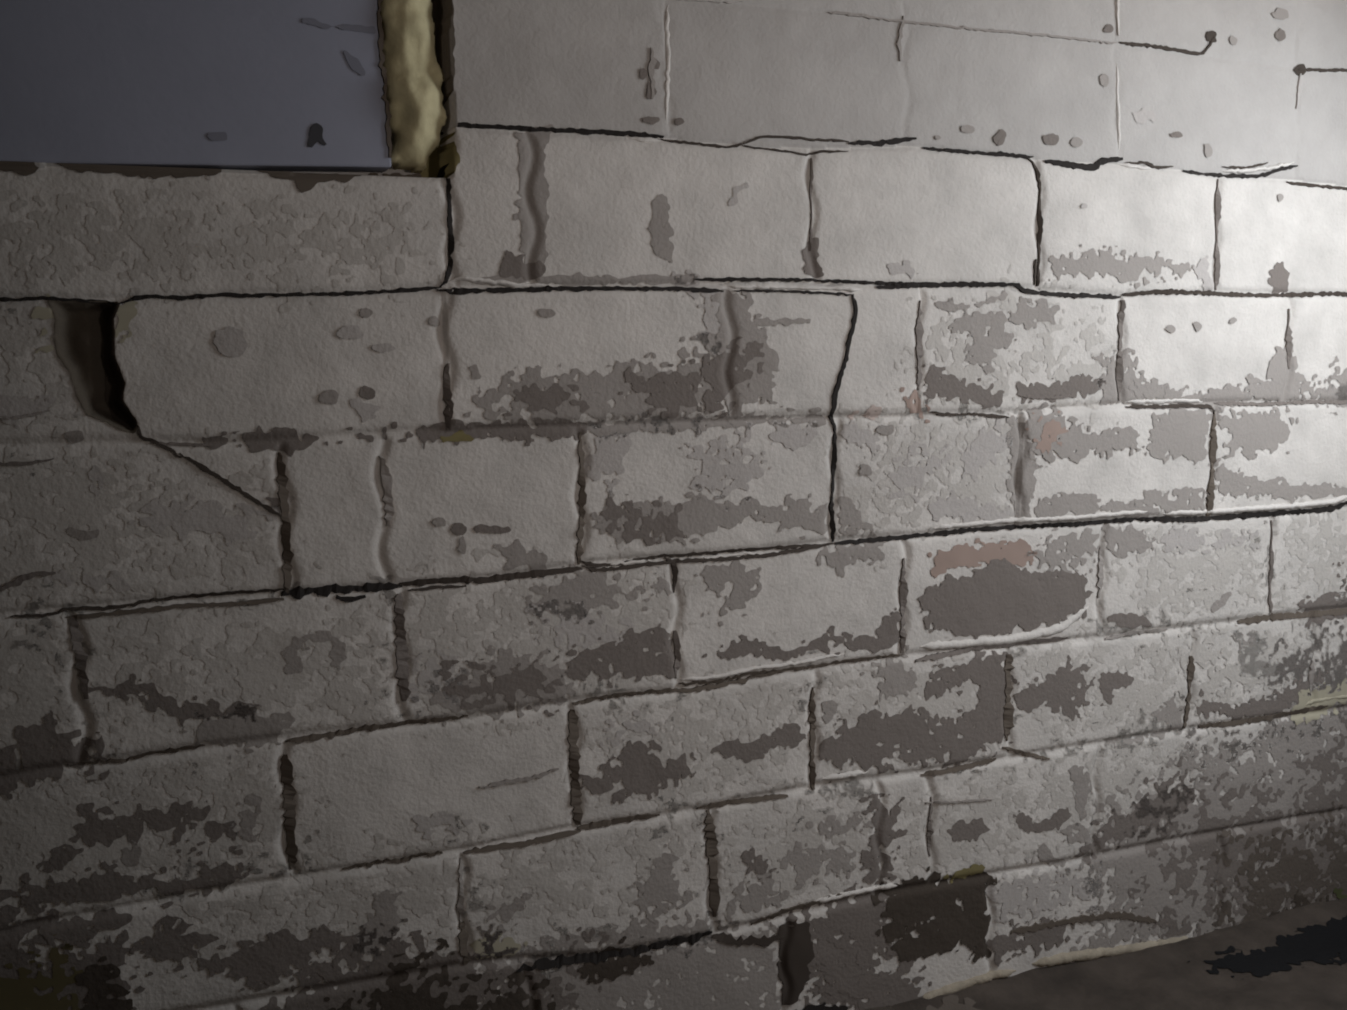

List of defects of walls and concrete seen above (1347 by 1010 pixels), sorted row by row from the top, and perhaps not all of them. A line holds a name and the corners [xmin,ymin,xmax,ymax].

water stain [640,59,660,99]
crack [1295,68,1347,109]
water stain [643,116,685,126]
water stain [993,129,1006,146]
water stain [1043,133,1083,147]
water stain [420,131,460,193]
water stain [648,194,674,263]
water stain [0,180,436,343]
water stain [802,237,824,278]
crack [0,122,1347,620]
water stain [0,244,1347,1010]
crack [1238,608,1347,625]